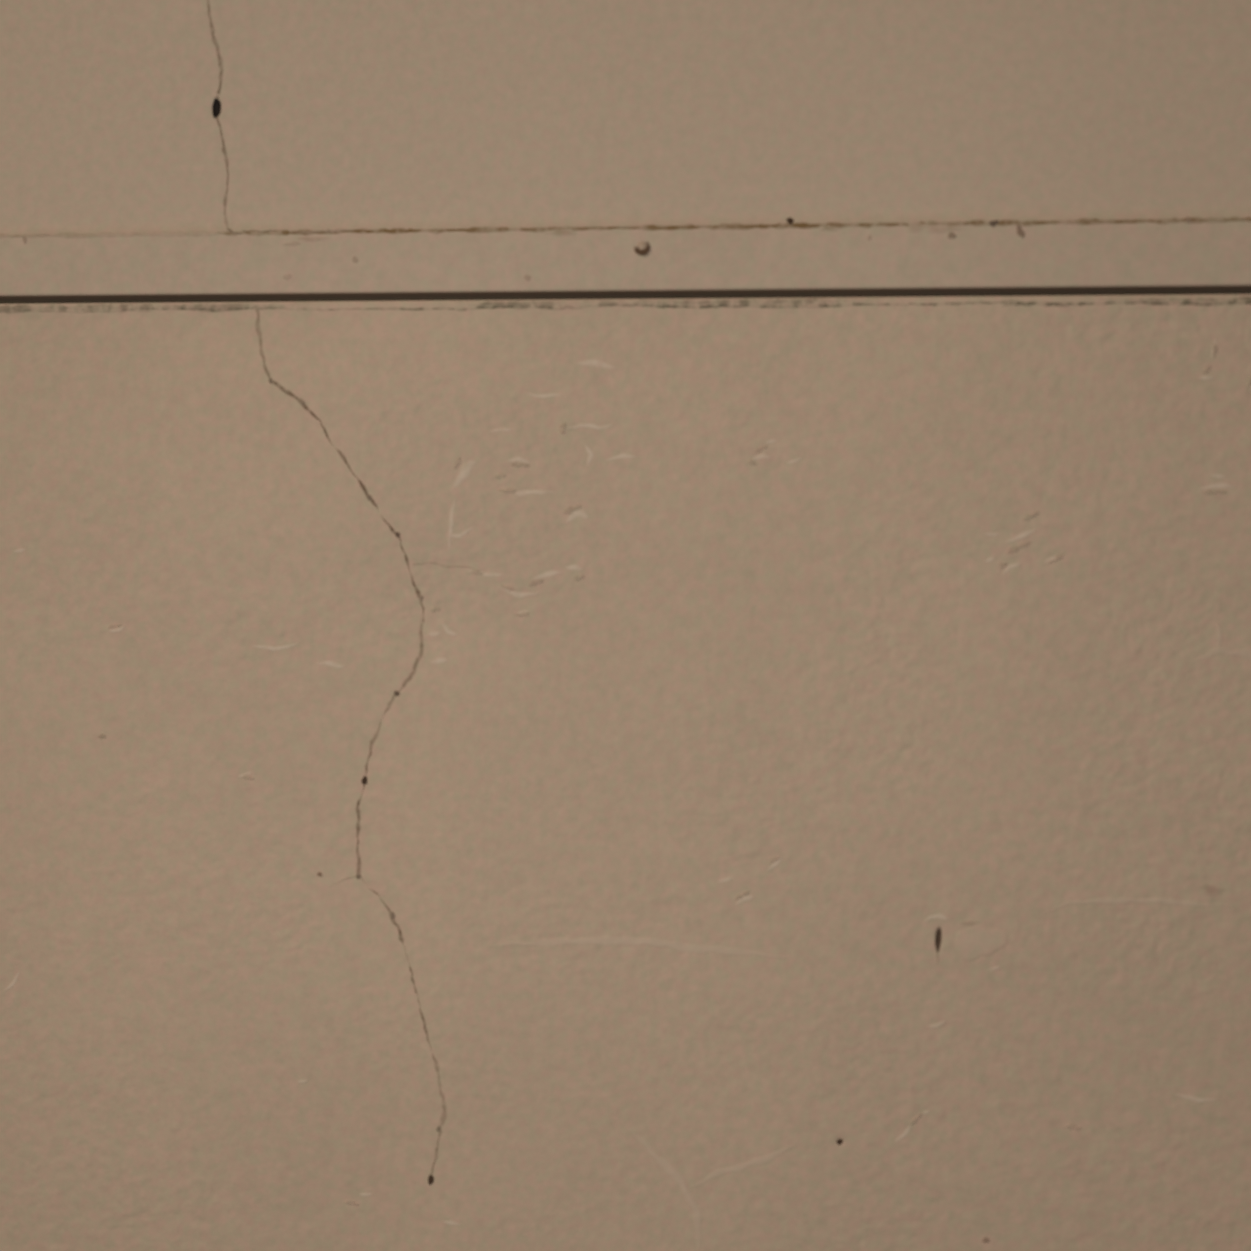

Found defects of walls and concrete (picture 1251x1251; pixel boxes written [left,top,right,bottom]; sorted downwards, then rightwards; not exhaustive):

crack [207,0,241,235]
crack [0,300,1251,1186]